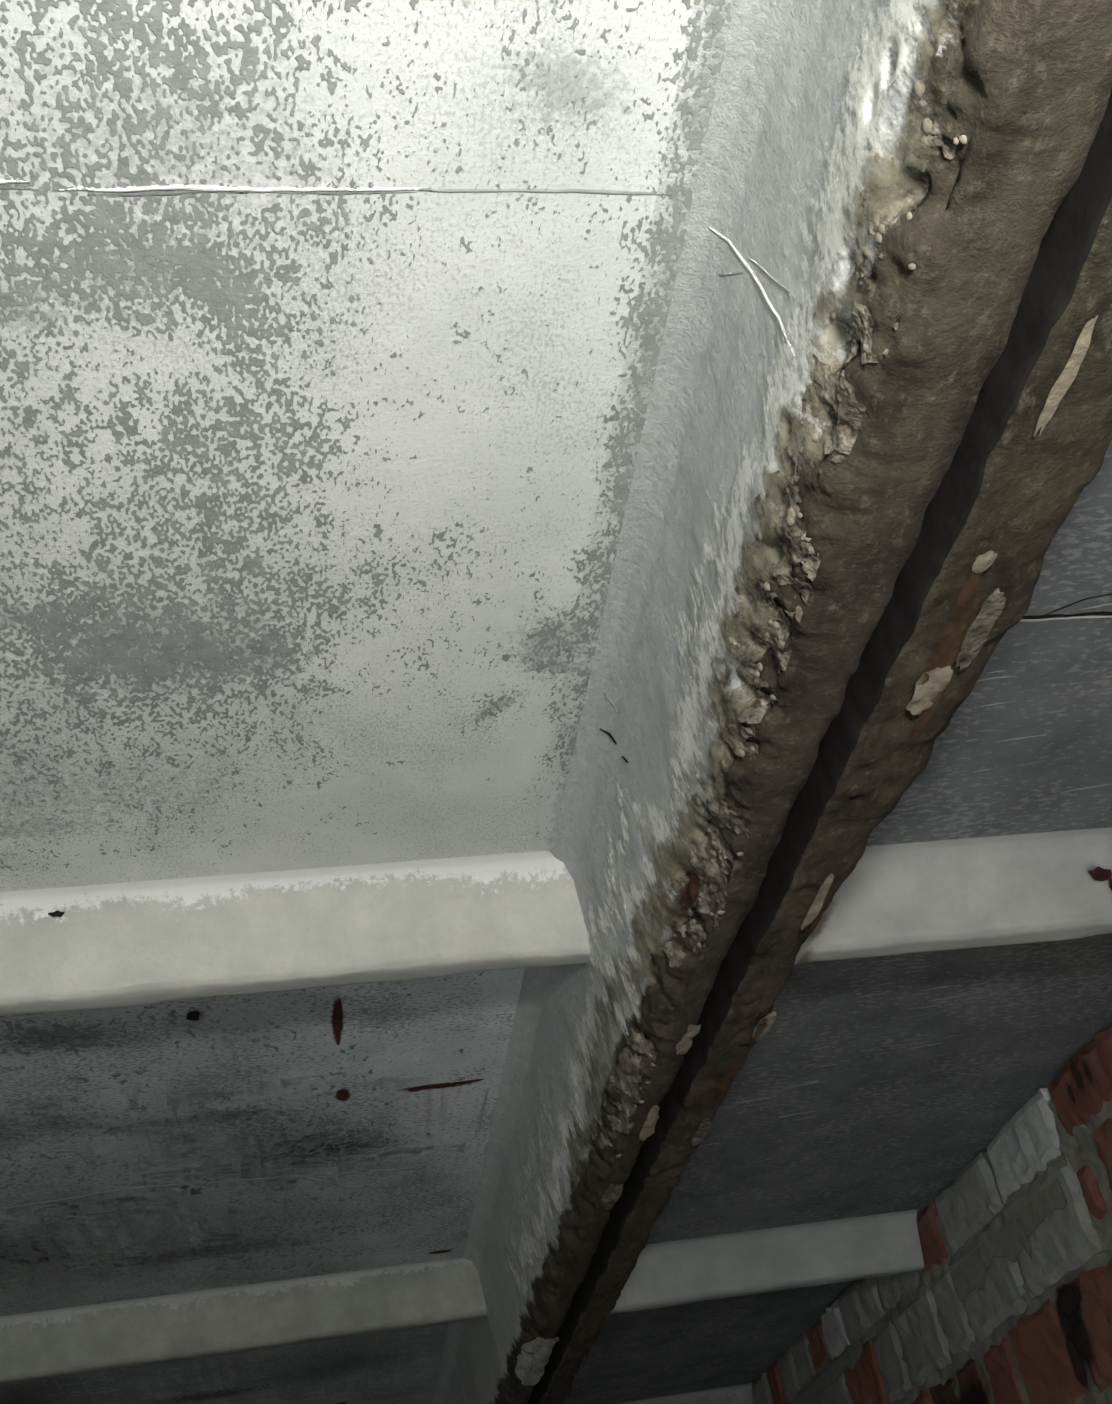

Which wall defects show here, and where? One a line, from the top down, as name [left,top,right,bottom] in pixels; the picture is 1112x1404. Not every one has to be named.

crack [0,179,673,197]
crack [709,227,814,357]
spalling [1033,315,1098,437]
spalling [707,152,921,758]
crack [1019,593,1112,622]
damp [507,0,962,1306]
spalling [906,588,1006,715]
rust [1087,867,1112,890]
rust [332,998,343,1045]
rust [404,1079,484,1092]
damp [1058,1285,1082,1316]
damp [1066,1335,1088,1388]